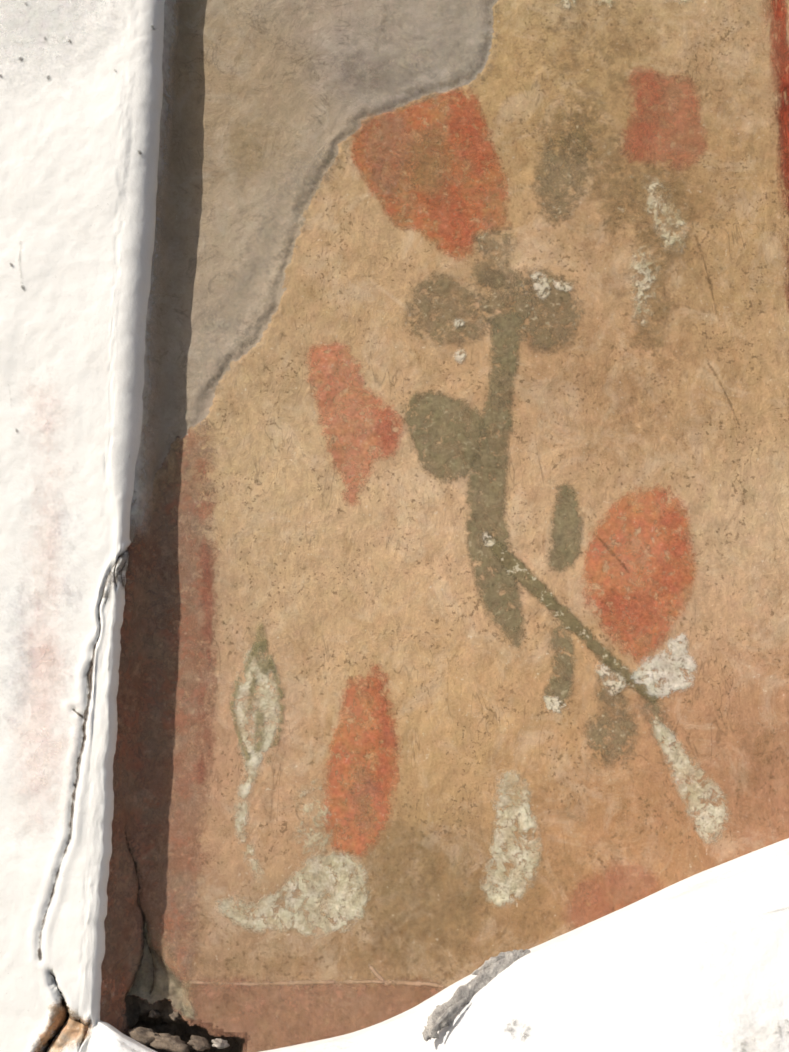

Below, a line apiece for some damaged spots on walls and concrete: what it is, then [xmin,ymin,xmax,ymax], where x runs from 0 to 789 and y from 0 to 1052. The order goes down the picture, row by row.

peeling [531,272,571,298]
crack [38,549,130,1052]
crack [125,832,154,994]
flaking render [101,922,197,1020]